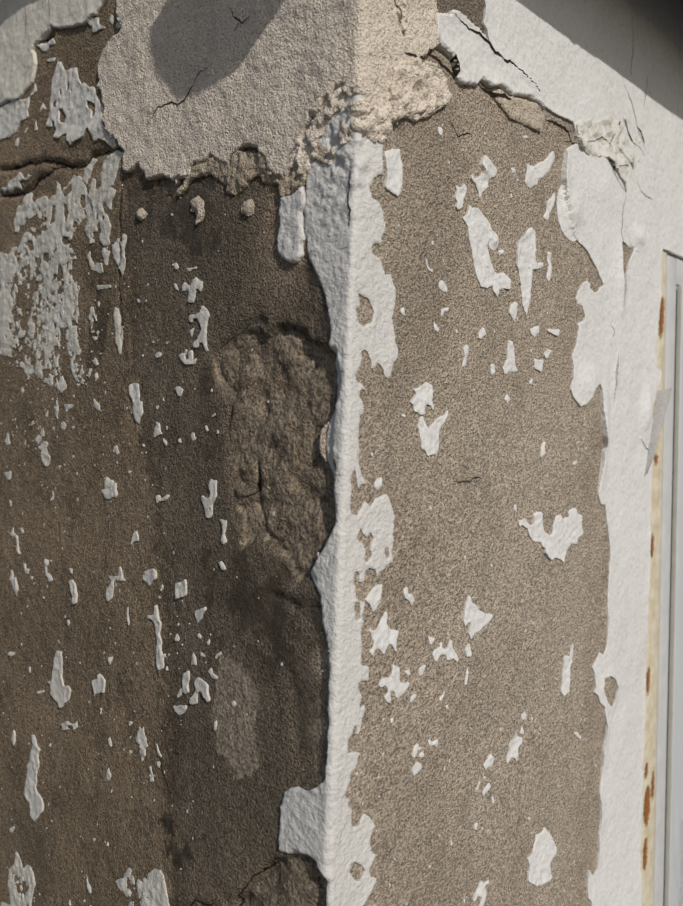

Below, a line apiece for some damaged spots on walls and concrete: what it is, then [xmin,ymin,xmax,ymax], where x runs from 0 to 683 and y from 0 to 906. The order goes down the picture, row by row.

crack [405,49,511,100]
crack [447,12,540,91]
crack [546,20,651,238]
leakage [162,182,219,255]
peeling [0,0,338,906]
peeling [345,0,641,906]
rust [644,763,655,826]
mould [158,812,194,868]
crack [239,861,279,906]